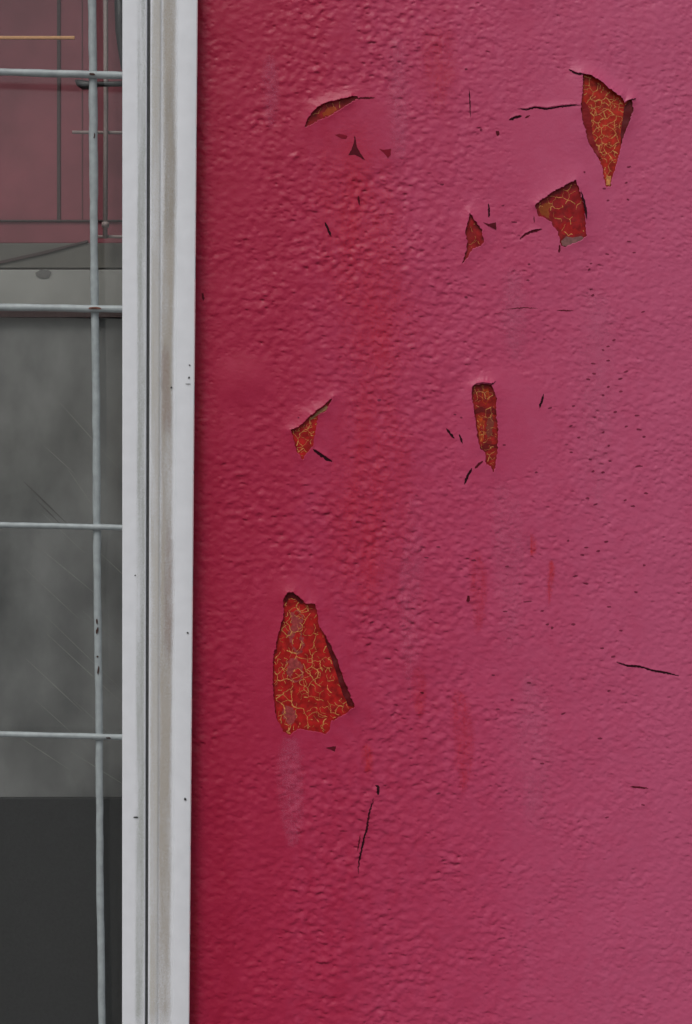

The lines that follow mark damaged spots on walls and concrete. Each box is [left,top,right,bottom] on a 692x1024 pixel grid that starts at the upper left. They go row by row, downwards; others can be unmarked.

peeling [305,96,358,127]
crack [509,105,575,120]
peeling [581,74,633,201]
peeling [462,214,496,263]
peeling [535,171,587,247]
peeling [291,399,332,460]
peeling [453,383,506,472]
peeling [273,592,355,735]
crack [617,662,679,676]
crack [357,785,380,873]